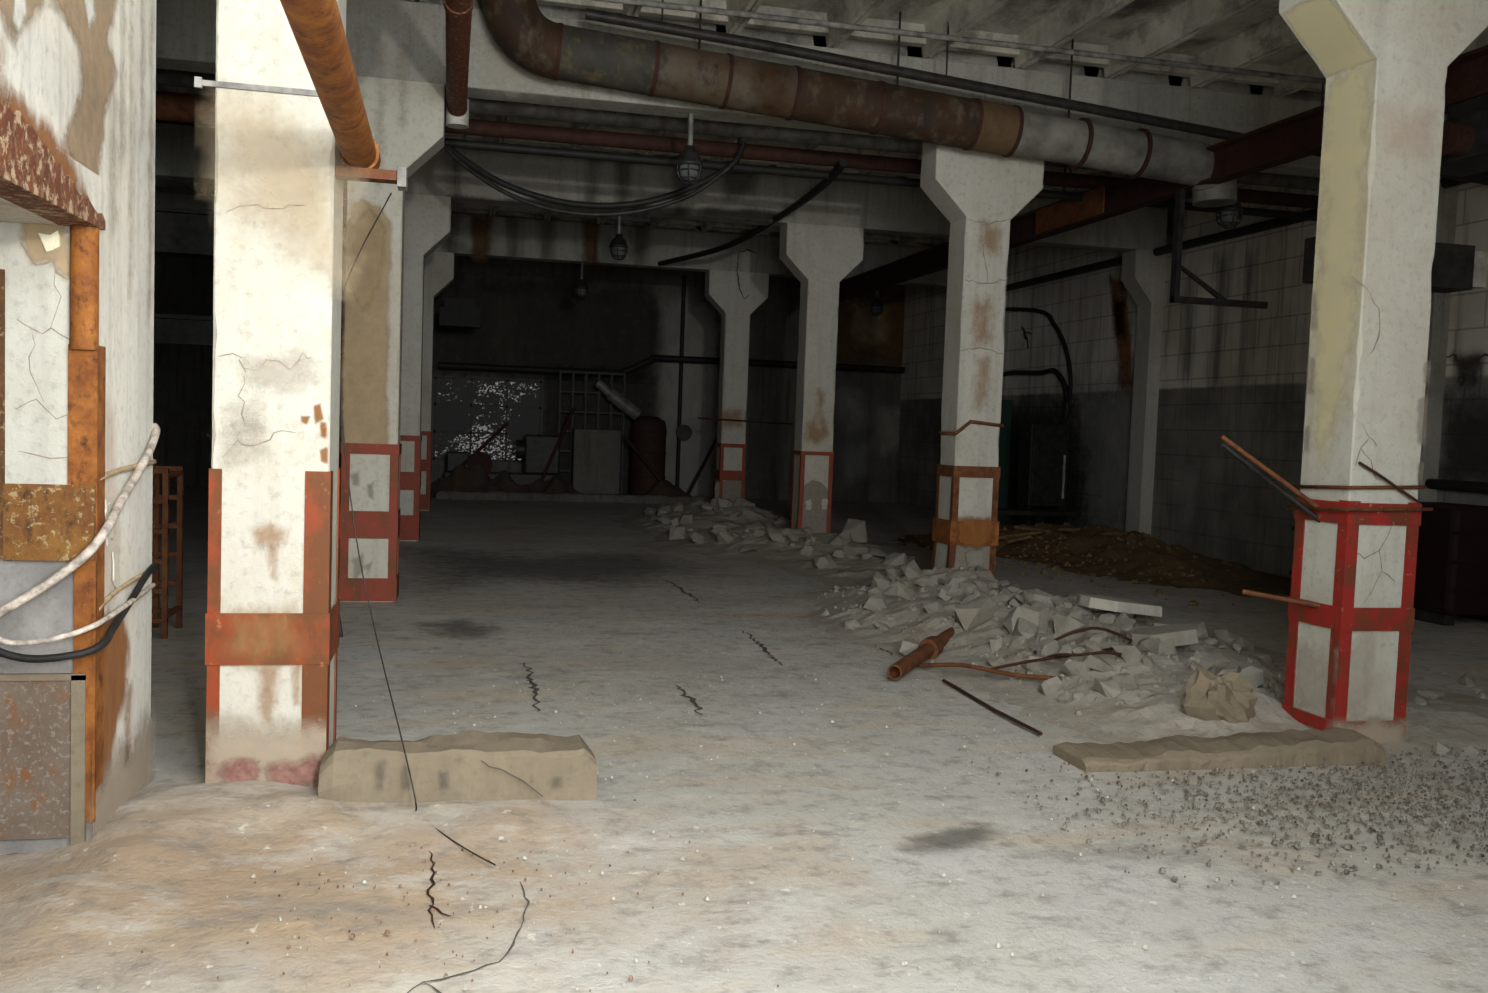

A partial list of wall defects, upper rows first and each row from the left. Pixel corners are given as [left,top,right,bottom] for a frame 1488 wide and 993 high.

peeling [0,0,117,174]
corrosion [0,88,86,194]
crack [1357,526,1395,603]
crack [523,662,541,711]
crack [676,685,703,715]
crack [742,631,782,665]
crack [427,851,451,928]
crack [407,882,530,993]